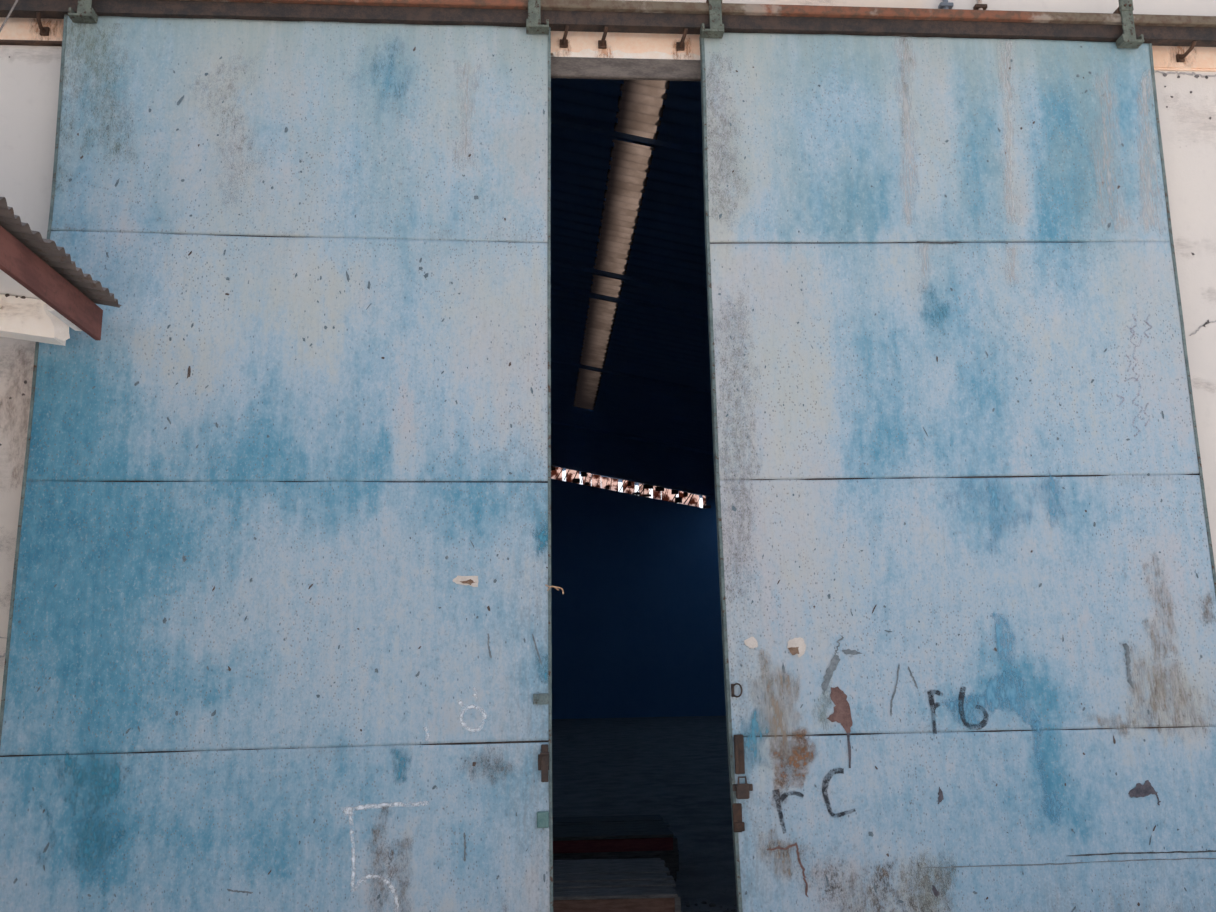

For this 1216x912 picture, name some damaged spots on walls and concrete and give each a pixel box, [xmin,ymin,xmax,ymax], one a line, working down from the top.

crack [1189,320,1216,336]
corrosion [764,660,814,790]